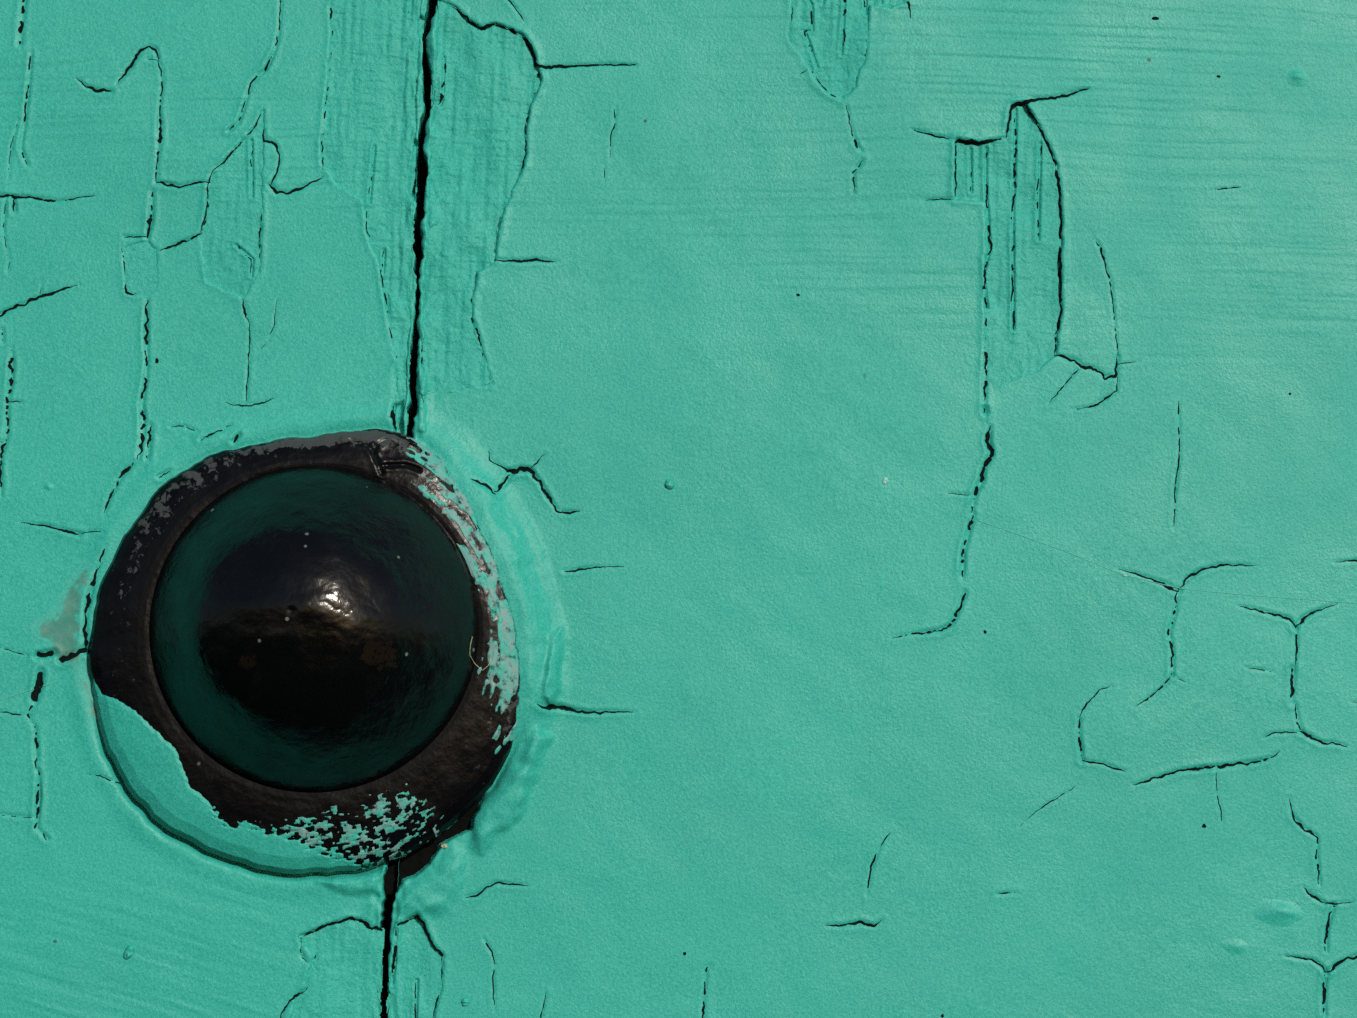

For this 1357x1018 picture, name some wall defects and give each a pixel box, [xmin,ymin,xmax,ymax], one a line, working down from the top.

crack [494,216,554,263]
crack [0,0,329,840]
crack [355,270,424,472]
crack [472,453,578,514]
crack [895,318,994,638]
crack [1050,242,1132,409]
crack [537,703,630,715]
crack [1022,603,1346,824]
crack [1120,564,1255,706]
spalling [384,796,483,895]
crack [827,919,880,927]
crack [1288,798,1357,1013]